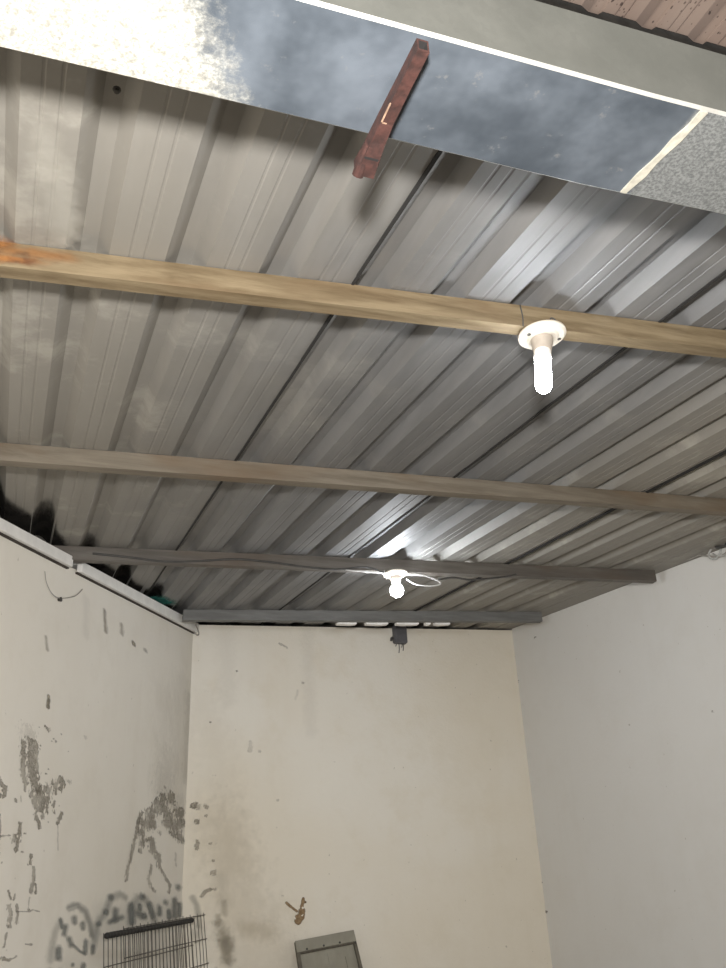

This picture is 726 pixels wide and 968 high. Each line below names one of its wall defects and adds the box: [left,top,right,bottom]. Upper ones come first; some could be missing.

water stain [0,486,66,546]
water stain [86,563,176,610]
peeling [20,736,66,829]
peeling [13,822,37,895]
peeling [125,790,185,893]